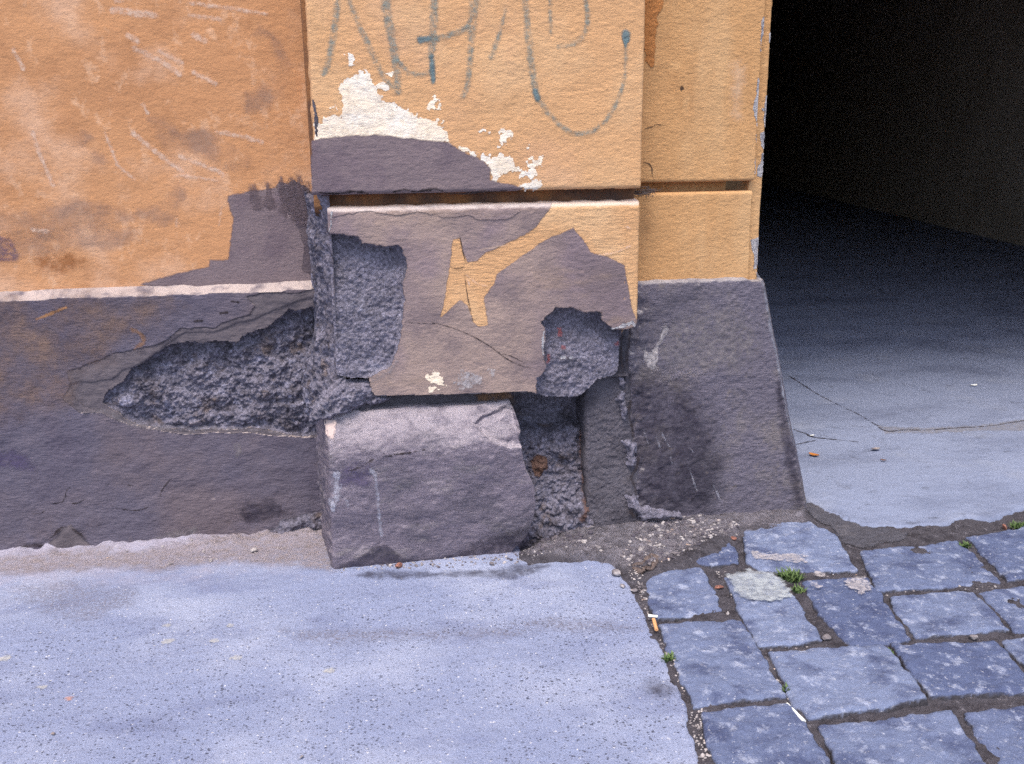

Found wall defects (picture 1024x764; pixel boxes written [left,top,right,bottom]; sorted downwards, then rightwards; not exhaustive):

peeling [312,53,543,195]
flaking render [62,190,520,439]
crack [409,238,524,367]
flaking render [535,307,635,397]